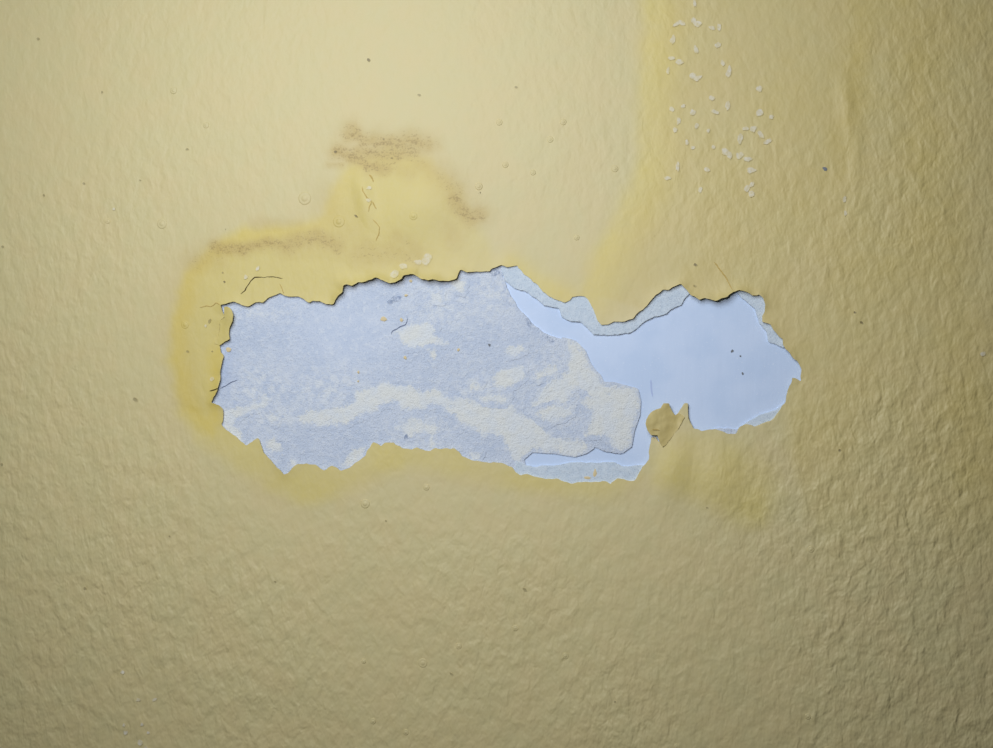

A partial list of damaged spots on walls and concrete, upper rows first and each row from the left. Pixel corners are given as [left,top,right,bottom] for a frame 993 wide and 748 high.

peeling [204,253,801,484]
damp [157,0,993,606]